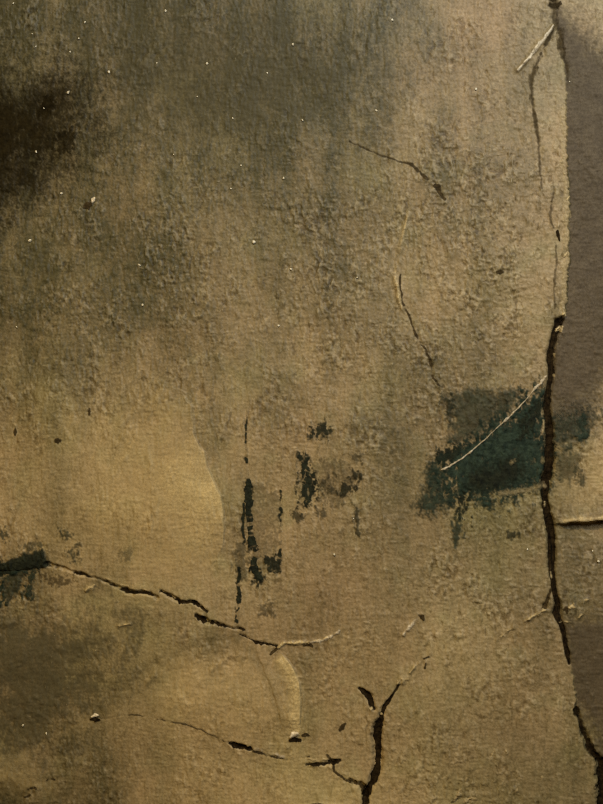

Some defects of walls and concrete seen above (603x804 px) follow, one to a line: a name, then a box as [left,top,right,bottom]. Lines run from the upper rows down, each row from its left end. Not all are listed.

crack [530,0,568,172]
leakage [418,10,603,548]
leakage [307,422,332,439]
leakage [295,451,317,508]
leakage [340,470,362,497]
crack [541,316,570,664]
leakage [0,549,50,607]
crack [74,571,340,655]
leakage [235,478,282,623]
crack [162,719,284,759]
crack [306,656,429,804]
crack [573,707,603,804]